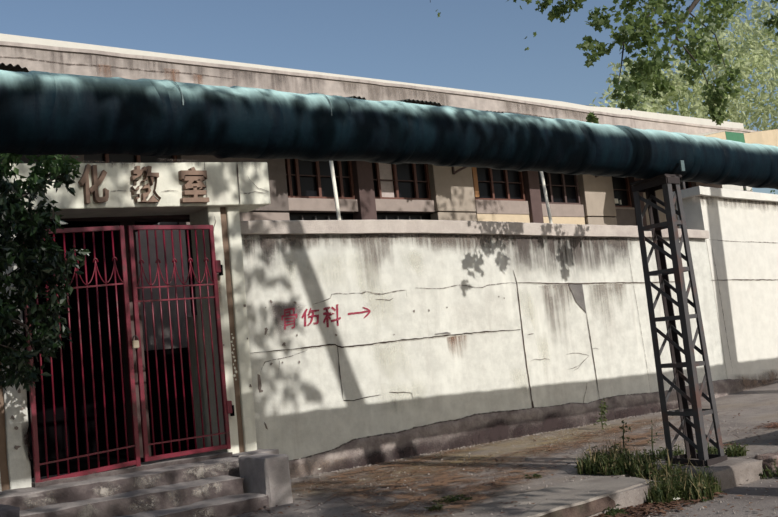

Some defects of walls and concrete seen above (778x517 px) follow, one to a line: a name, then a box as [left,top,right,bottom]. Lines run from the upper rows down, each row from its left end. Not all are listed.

damp [244,234,310,252]
damp [356,234,396,261]
damp [411,234,627,259]
crack [315,282,645,304]
damp [544,284,571,319]
damp [594,283,623,298]
crack [254,309,655,460]
damp [311,401,691,473]